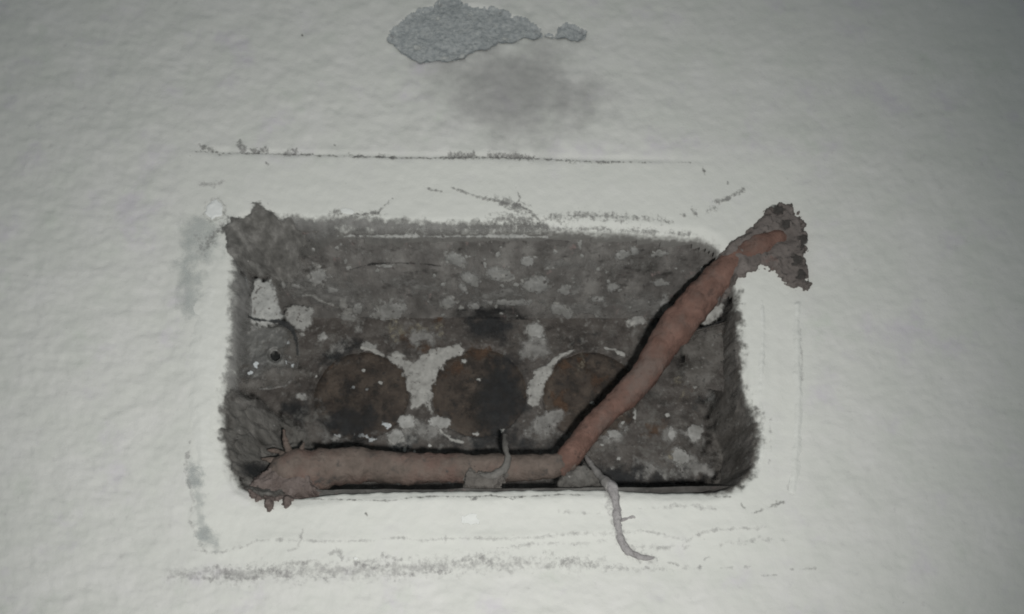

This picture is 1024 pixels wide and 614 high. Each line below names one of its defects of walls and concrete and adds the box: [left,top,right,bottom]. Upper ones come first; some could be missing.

peeling [387,0,587,64]